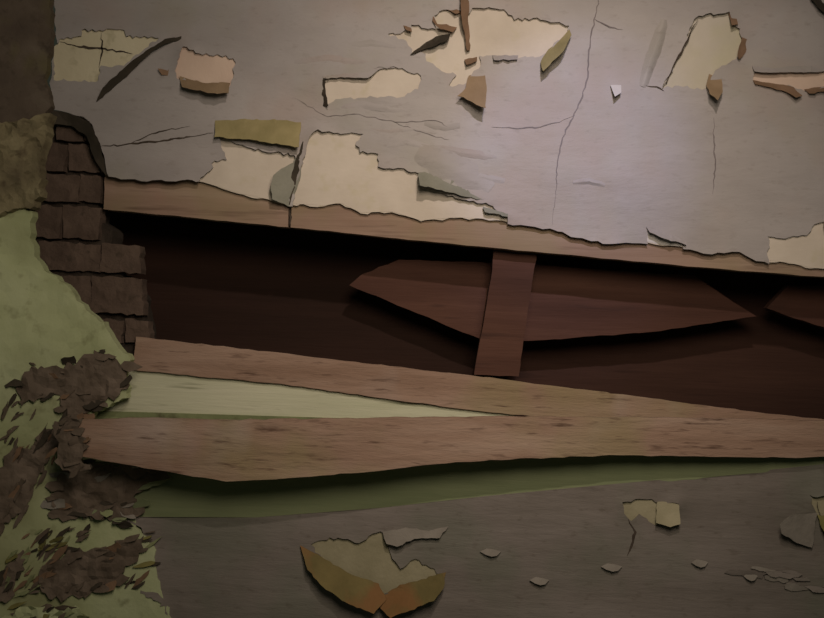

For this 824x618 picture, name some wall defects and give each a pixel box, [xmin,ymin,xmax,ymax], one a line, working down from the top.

peeling [54,29,236,102]
peeling [322,66,421,106]
peeling [389,0,571,108]
crack [498,0,617,224]
peeling [662,12,747,101]
peeling [752,66,824,98]
peeling [200,119,508,222]
peeling [767,222,824,269]
flaking render [0,110,171,618]
peeling [300,526,448,618]
peeling [622,499,680,556]
peeling [780,495,824,548]